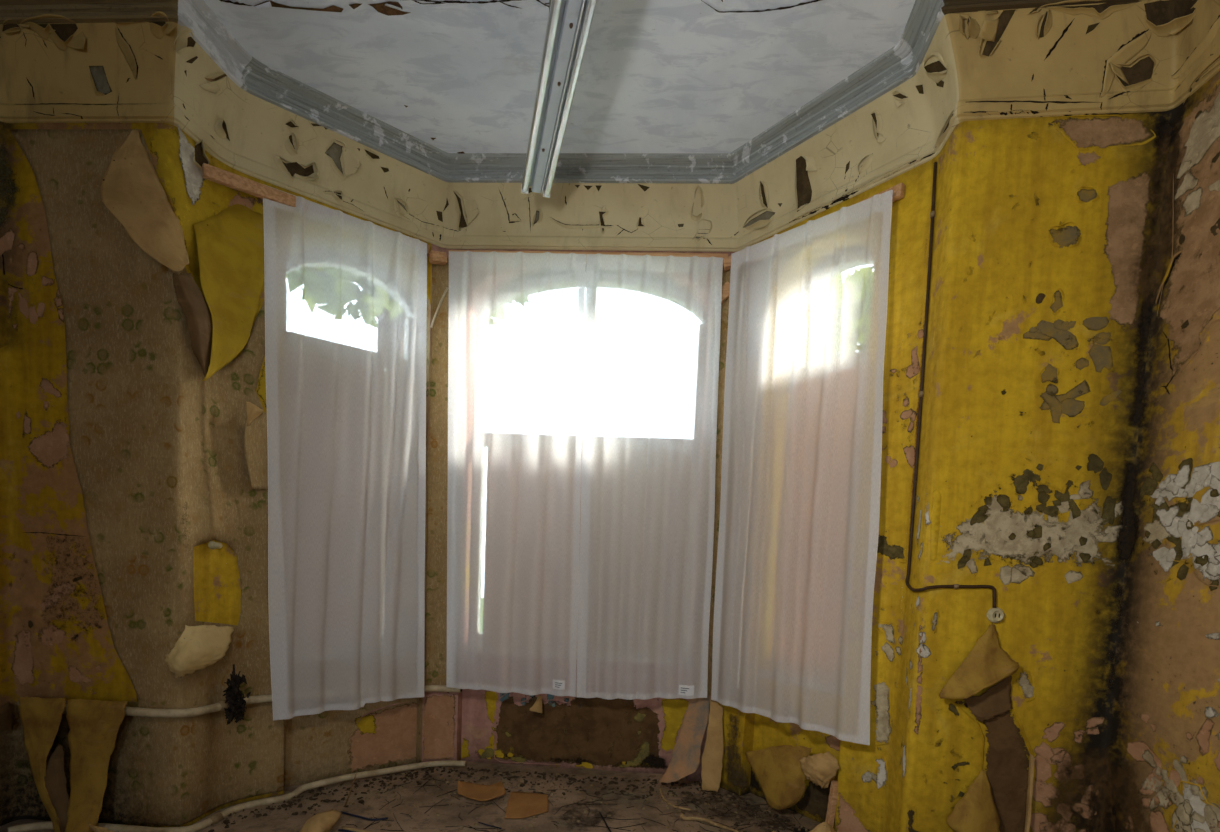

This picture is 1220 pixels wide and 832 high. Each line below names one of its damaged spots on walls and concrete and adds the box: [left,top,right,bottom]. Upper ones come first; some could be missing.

crack [400,0,549,9]
crack [701,0,821,13]
peeling [953,0,1198,58]
spalling [148,119,263,297]
peeling [743,156,817,230]
spalling [1157,55,1220,378]
spalling [1023,170,1152,428]
spalling [877,446,1220,591]
mould [1116,462,1138,563]
spalling [347,691,689,773]
spalling [945,669,1104,832]
spalling [1125,697,1220,832]